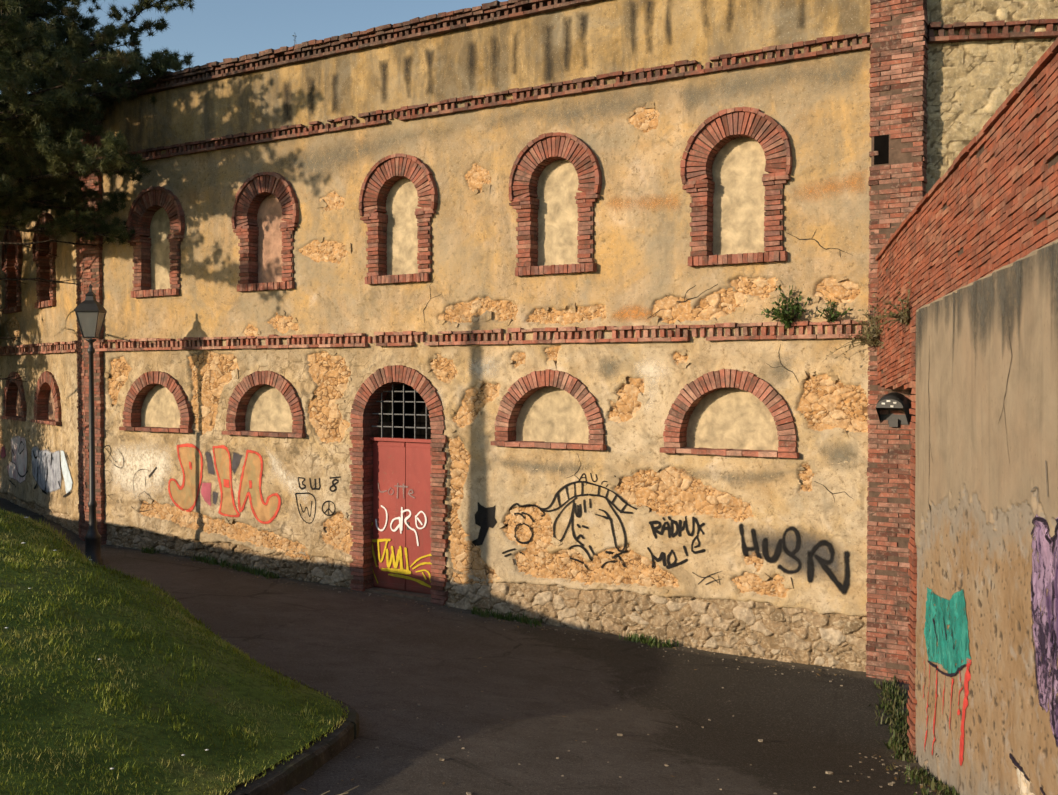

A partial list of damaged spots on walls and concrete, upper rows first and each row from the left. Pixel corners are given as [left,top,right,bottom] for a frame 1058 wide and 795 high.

leakage [565,15,587,67]
flaking render [625,101,660,133]
crack [788,229,852,257]
flaking render [438,296,606,328]
flaking render [651,276,784,326]
flaking render [812,274,861,306]
flaking render [605,375,650,424]
flaking render [796,368,870,438]
flaking render [447,378,501,589]
flaking render [605,465,756,522]
flaking render [496,503,679,594]
flaking render [915,484,1058,795]